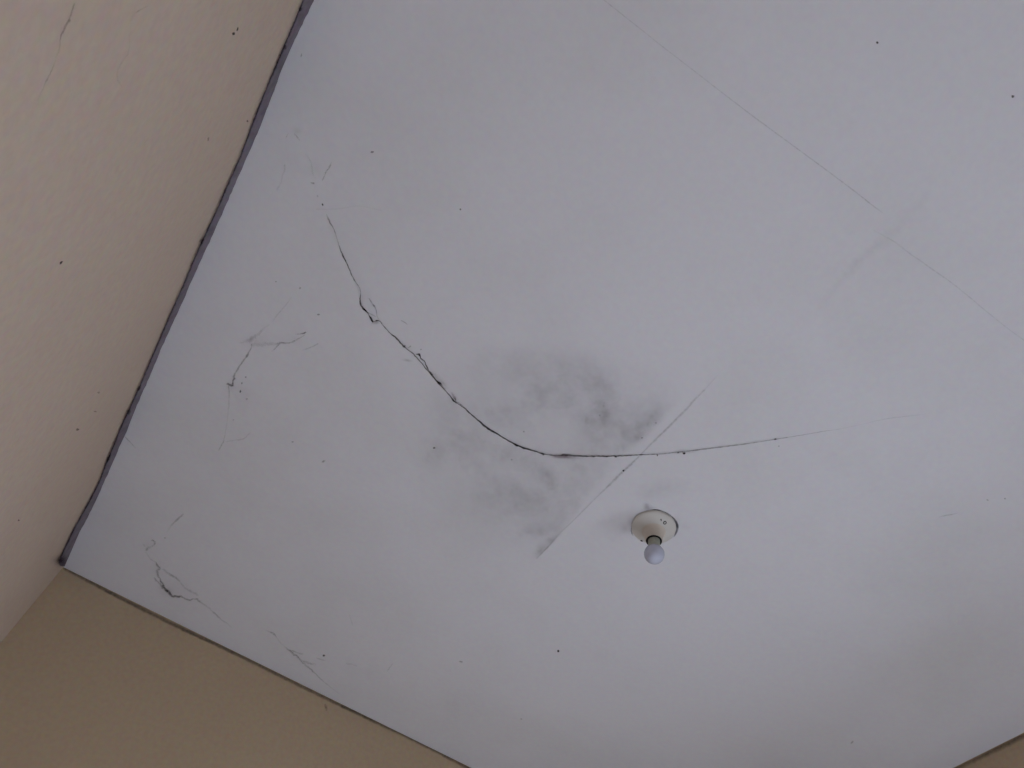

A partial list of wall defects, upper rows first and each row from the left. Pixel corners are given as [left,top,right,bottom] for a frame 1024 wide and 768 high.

crack [61,2,379,723]
crack [340,249,735,542]